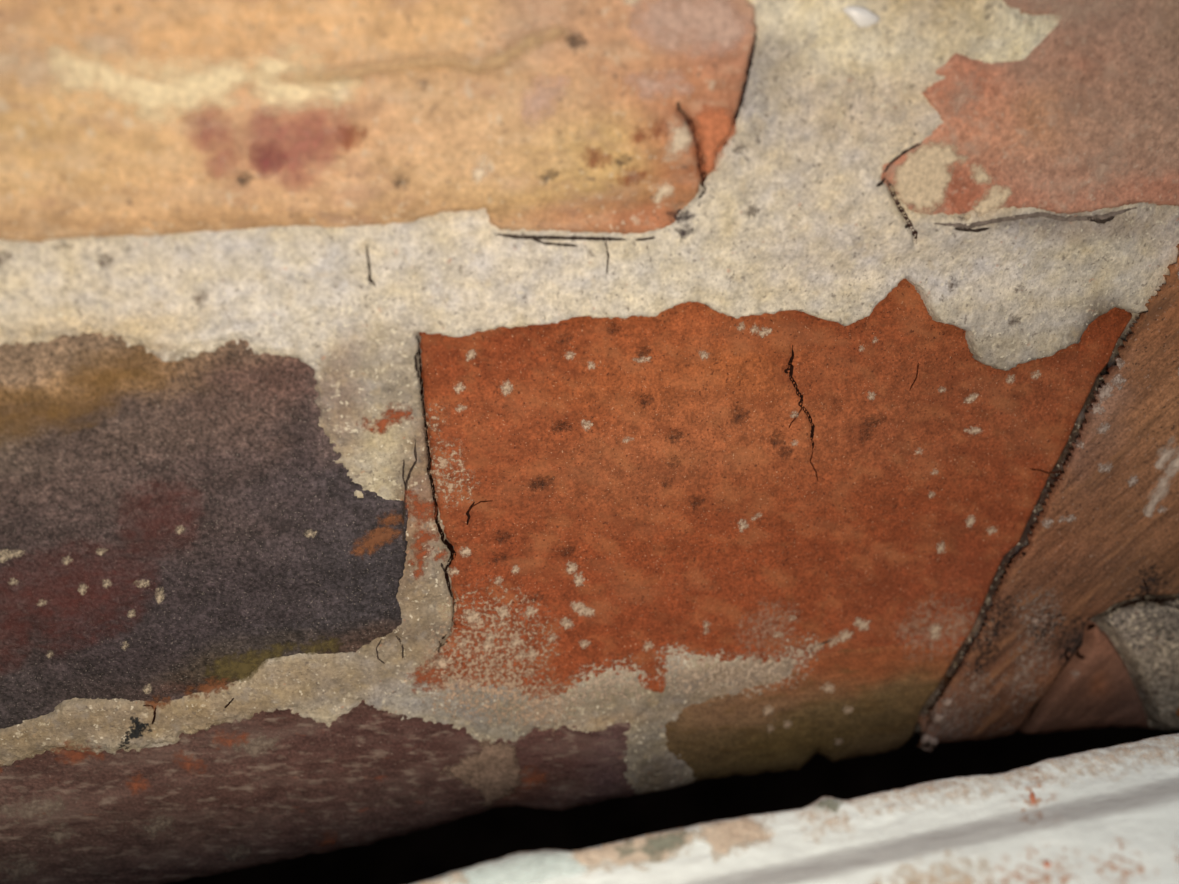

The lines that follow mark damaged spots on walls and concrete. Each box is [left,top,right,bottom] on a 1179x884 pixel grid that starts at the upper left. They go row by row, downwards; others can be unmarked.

crack [876,142,1137,243]
crack [784,345,818,481]
crack [402,335,493,653]
peeling [419,817,772,884]